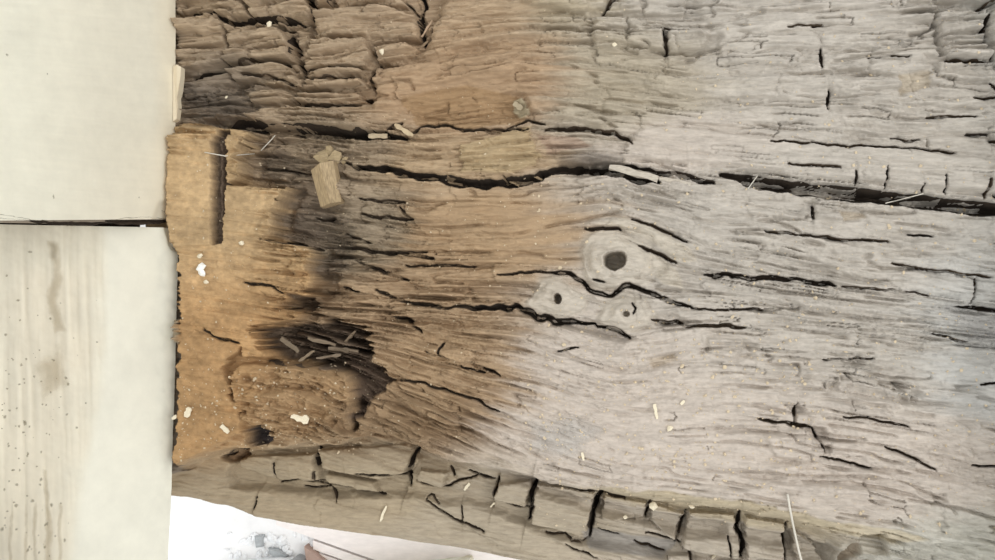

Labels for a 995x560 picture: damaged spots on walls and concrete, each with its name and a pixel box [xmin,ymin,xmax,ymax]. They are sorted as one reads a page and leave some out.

crack [404,0,432,47]
crack [193,0,384,108]
crack [421,120,633,144]
crack [270,168,312,176]
crack [266,240,325,251]
crack [705,206,995,313]
crack [317,198,764,376]
crack [400,379,499,411]
crack [273,446,708,560]
crack [727,510,745,557]